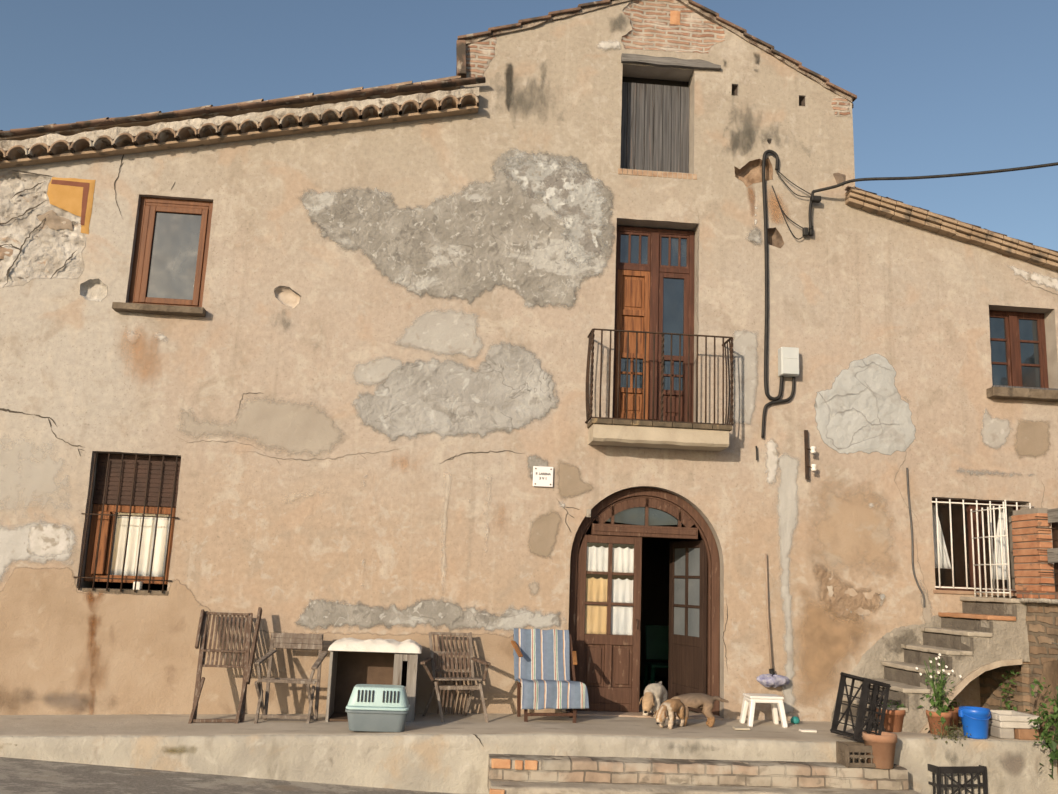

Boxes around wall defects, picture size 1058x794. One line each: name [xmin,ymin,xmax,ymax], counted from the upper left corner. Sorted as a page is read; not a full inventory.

flaking render [597,0,726,53]
flaking render [0,170,108,302]
crack [0,408,84,457]
crack [176,436,403,463]
peeling [0,523,562,715]
damp [766,439,864,714]
flaking render [815,565,886,621]